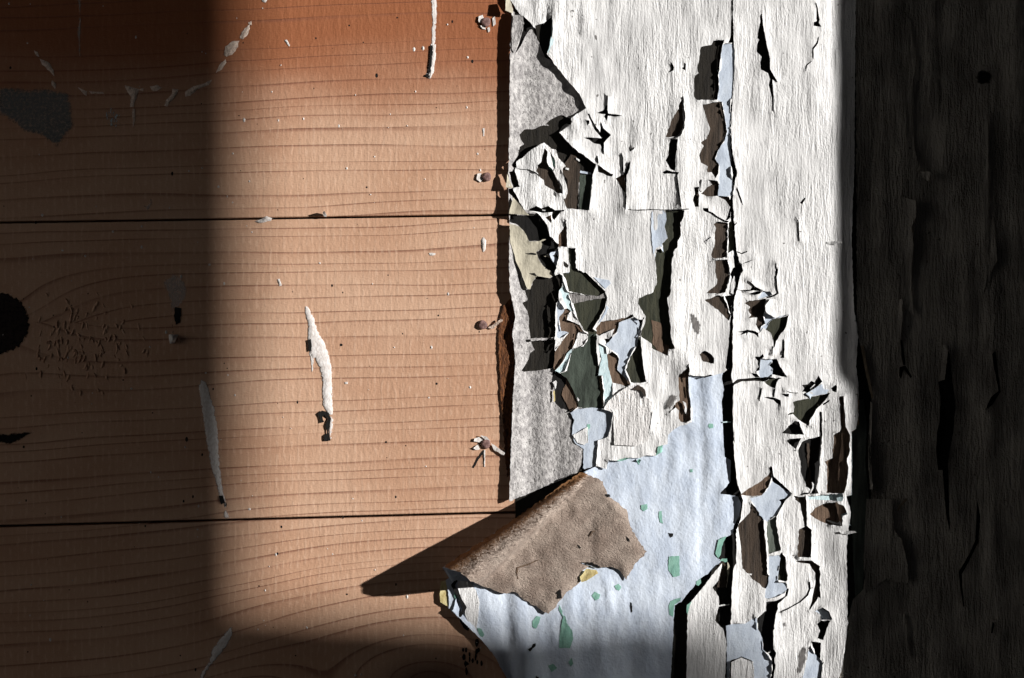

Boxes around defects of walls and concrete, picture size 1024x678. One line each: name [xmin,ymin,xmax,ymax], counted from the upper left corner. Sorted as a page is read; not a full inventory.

peeling [535,17,554,60]
peeling [506,40,735,471]
peeling [745,263,789,378]
peeling [726,345,909,678]
peeling [668,556,680,577]
peeling [559,606,573,666]
peeling [669,598,691,617]